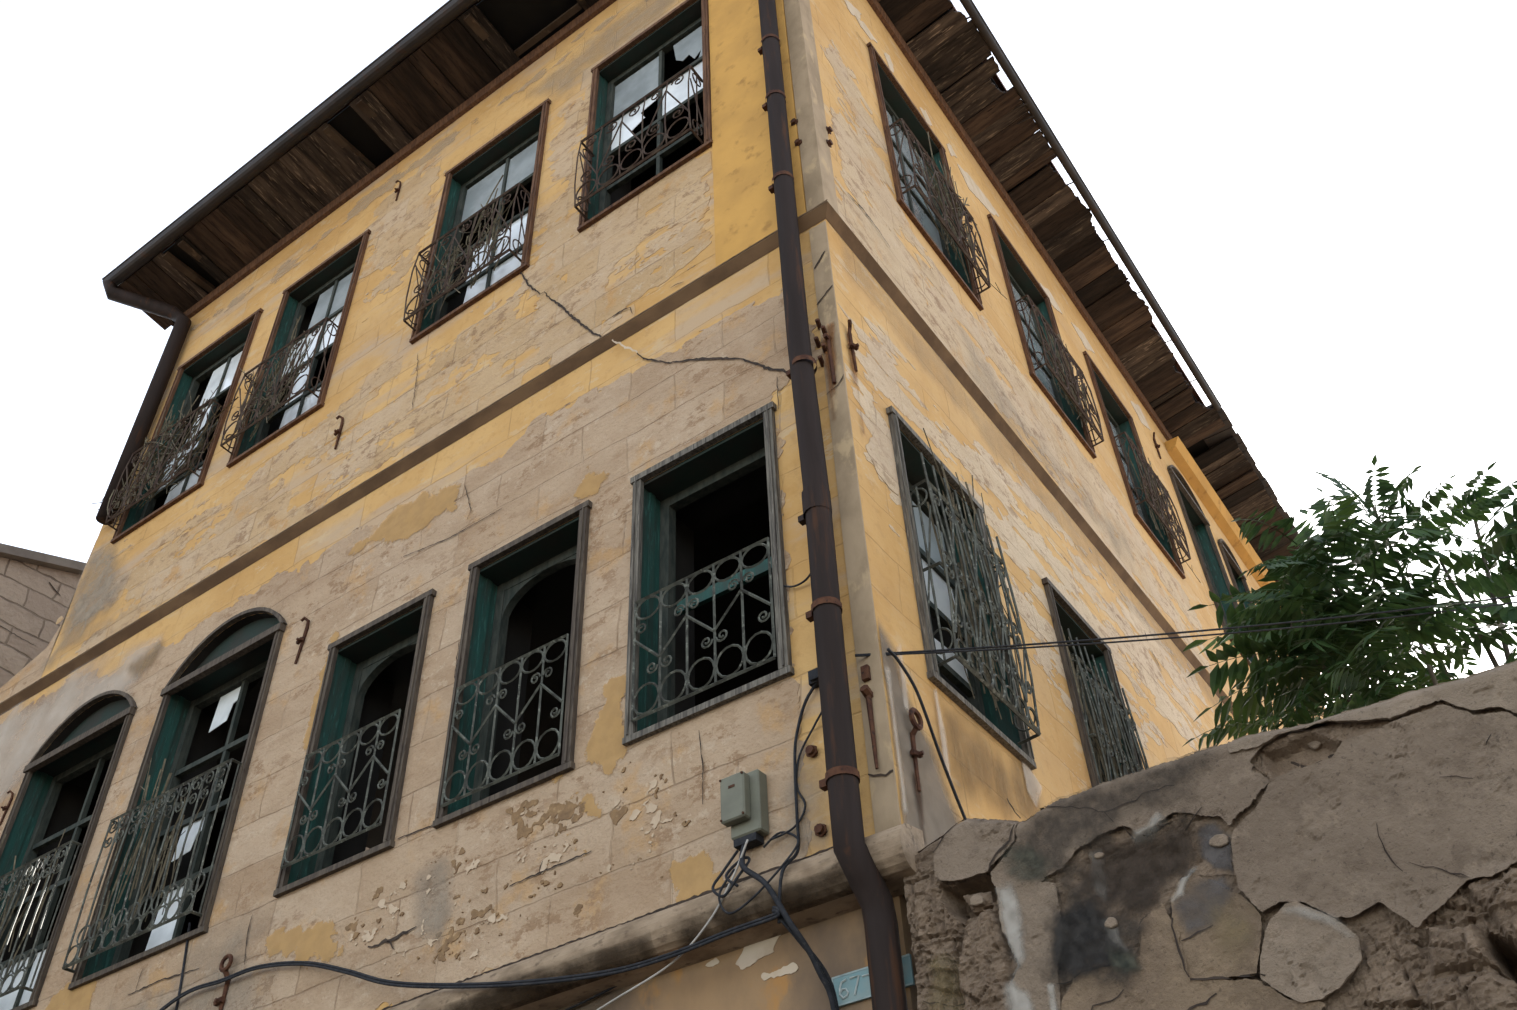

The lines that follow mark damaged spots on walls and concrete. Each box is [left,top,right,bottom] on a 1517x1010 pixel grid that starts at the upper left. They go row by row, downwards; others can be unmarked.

peeling [56,85,712,655]
crack [520,271,786,405]
peeling [808,318,822,364]
peeling [0,288,813,1010]
flaking render [915,877,1021,1010]
flaking render [1058,817,1236,957]
flaking render [1326,866,1517,1010]